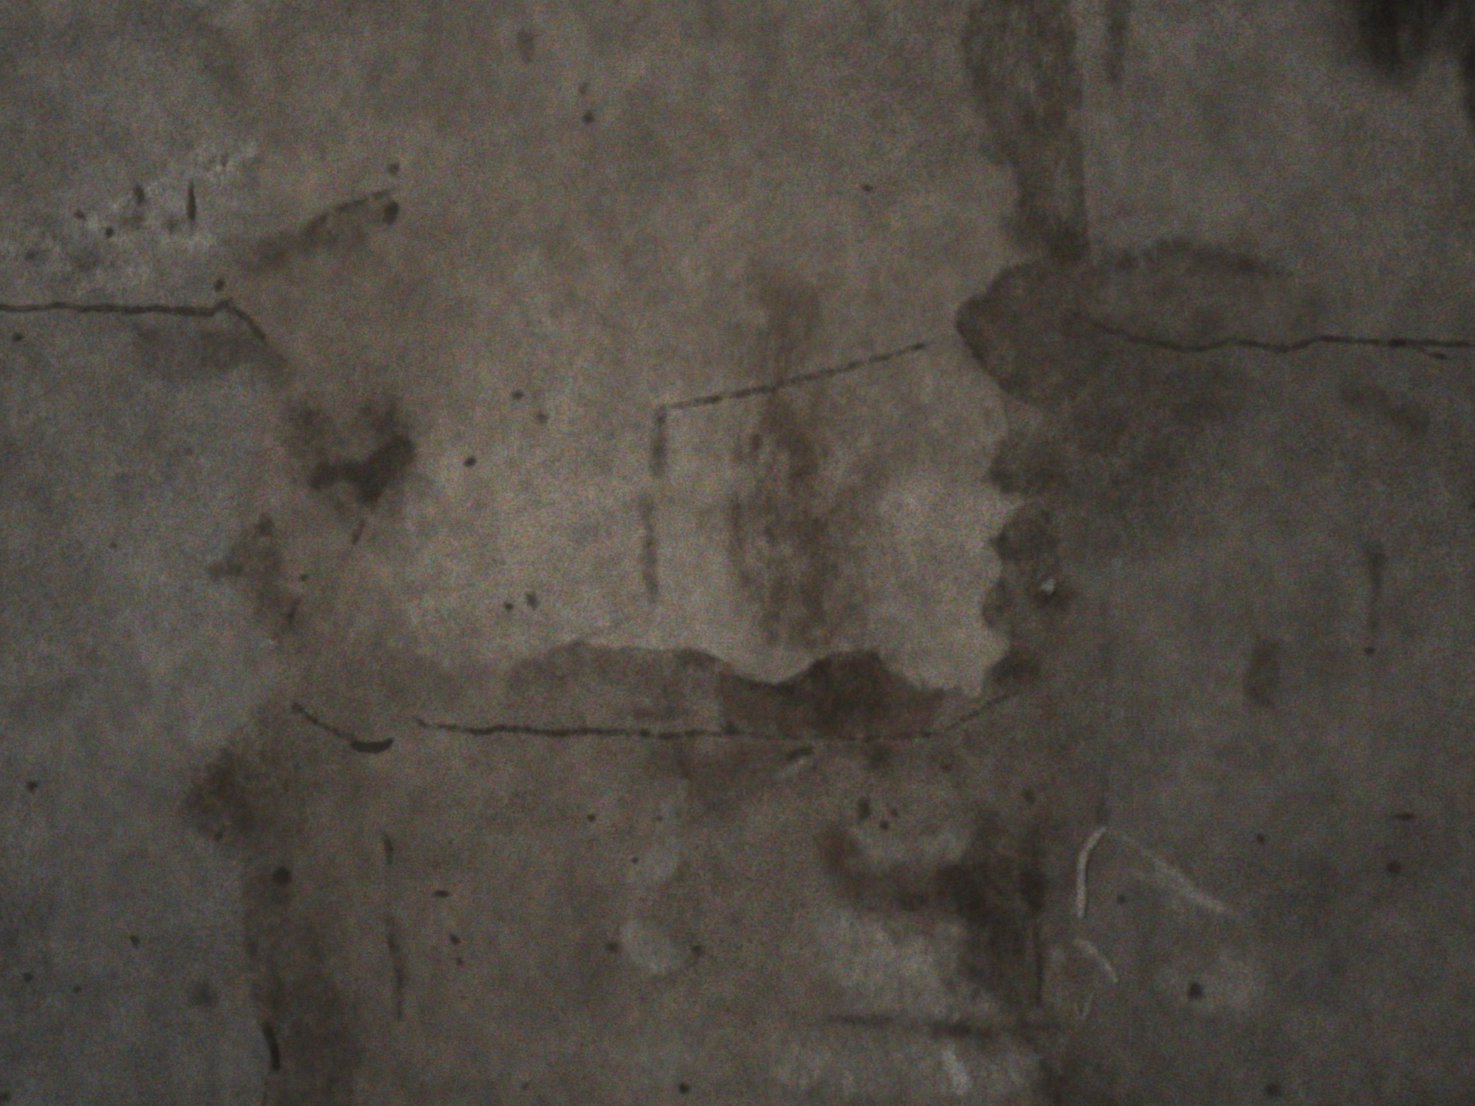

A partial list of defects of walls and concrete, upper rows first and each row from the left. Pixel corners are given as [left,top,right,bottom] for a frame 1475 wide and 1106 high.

crack [0,280,263,339]
crack [1160,336,1467,357]
crack [294,704,603,752]